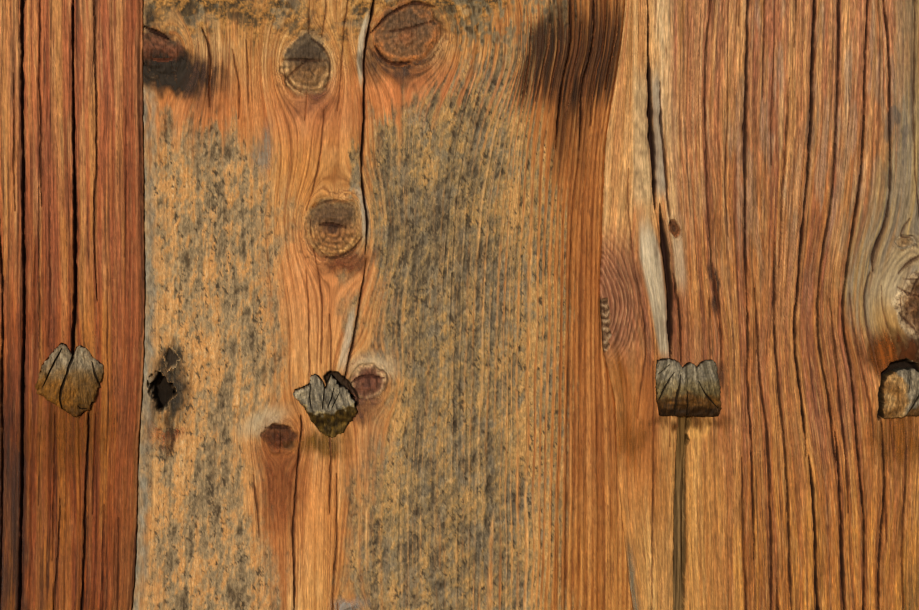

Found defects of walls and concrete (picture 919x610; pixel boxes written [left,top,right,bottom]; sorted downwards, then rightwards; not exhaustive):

crack [266,0,435,610]
crack [520,0,619,610]
crack [627,0,718,610]
crack [703,0,919,610]